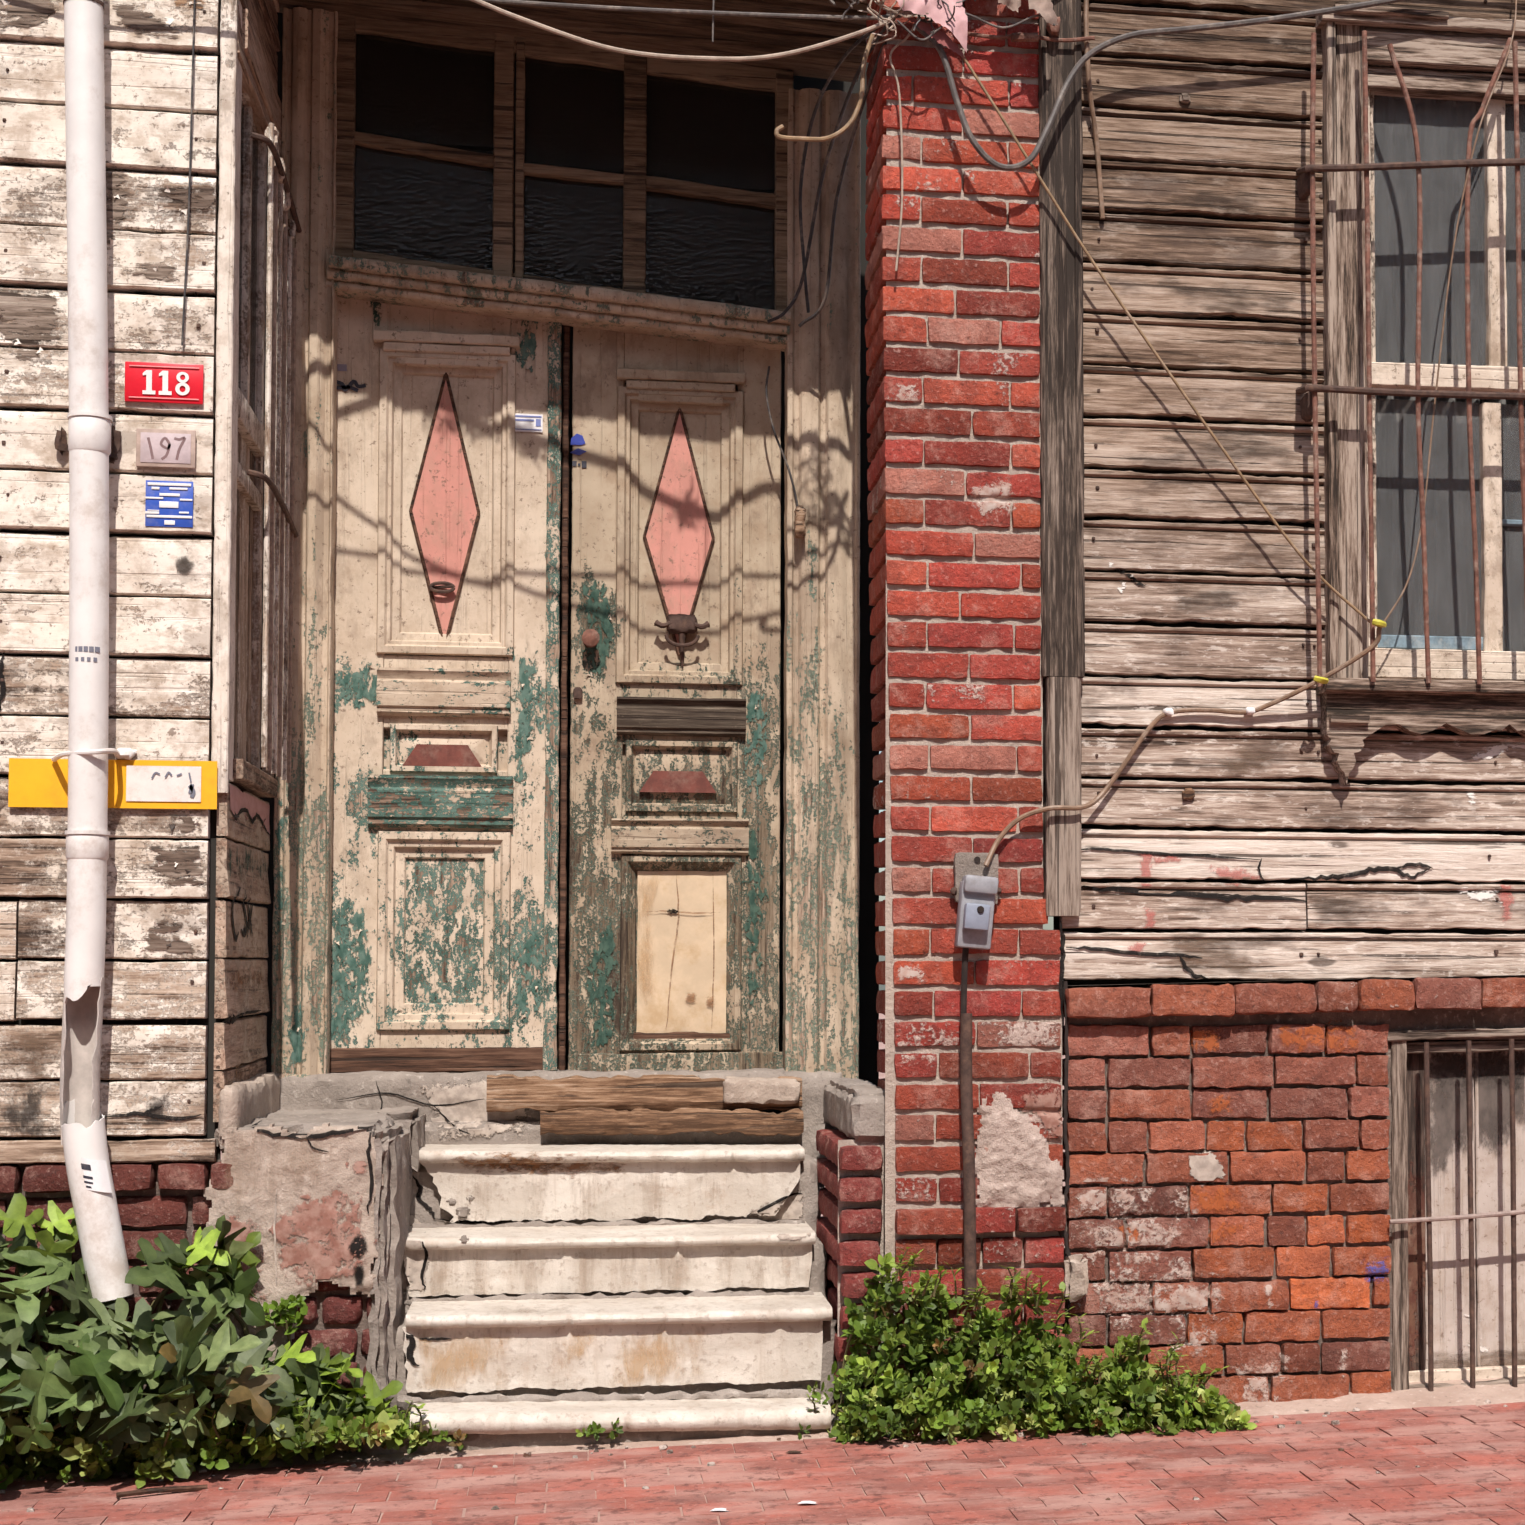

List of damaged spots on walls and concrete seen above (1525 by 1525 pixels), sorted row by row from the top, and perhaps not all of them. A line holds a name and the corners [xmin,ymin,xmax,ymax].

peeling [106,161,178,281]
peeling [0,288,63,374]
peeling [336,658,377,710]
peeling [512,656,542,821]
crack [1081,847,1433,902]
peeling [331,897,375,1037]
flaking render [222,1189,377,1314]
crack [252,1077,529,1213]
spalling [402,1214,429,1292]
crack [412,1176,523,1224]
crack [1058,918,1208,1257]
crack [406,1334,450,1366]